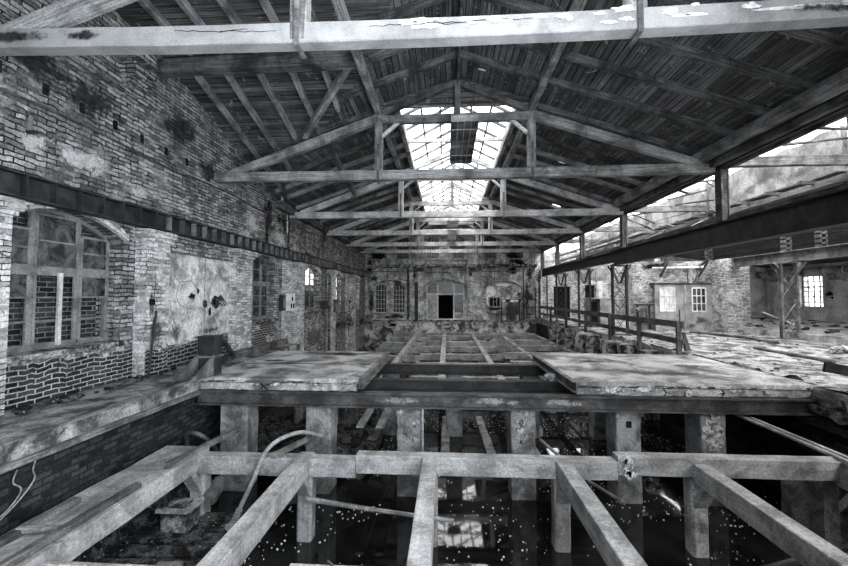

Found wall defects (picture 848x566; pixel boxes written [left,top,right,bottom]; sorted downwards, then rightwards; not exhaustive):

water stain [0,20,40,42]
water stain [69,30,98,40]
crack [174,27,266,35]
peeling [399,17,442,29]
peeling [458,16,512,24]
peeling [594,5,635,24]
peeling [742,0,848,11]
water stain [157,114,196,145]
water stain [198,160,215,181]
crack [153,269,198,331]
spalling [613,336,848,395]
spalling [725,398,848,456]